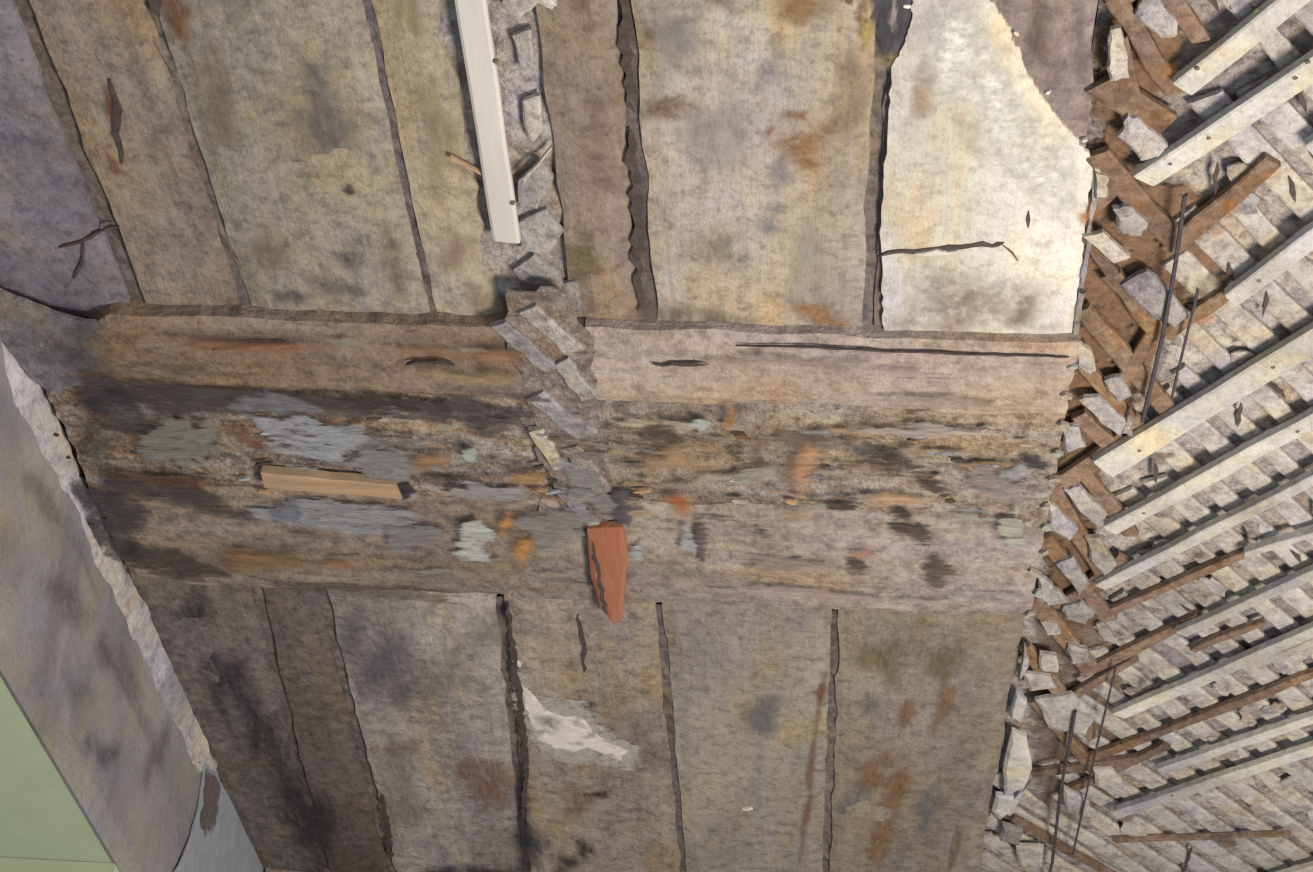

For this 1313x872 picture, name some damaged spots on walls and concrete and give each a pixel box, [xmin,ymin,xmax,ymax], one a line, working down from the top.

crack [878,211,1030,261]
crack [652,360,709,368]
crack [735,344,1069,358]
leakage [45,356,533,582]
peeling [113,393,1053,573]
leakage [768,435,955,502]
flaking render [2,343,265,872]
leakage [694,518,710,574]
peeling [714,556,945,605]
leakage [889,509,957,588]
flaking render [511,660,641,771]
flaking render [992,641,1032,819]